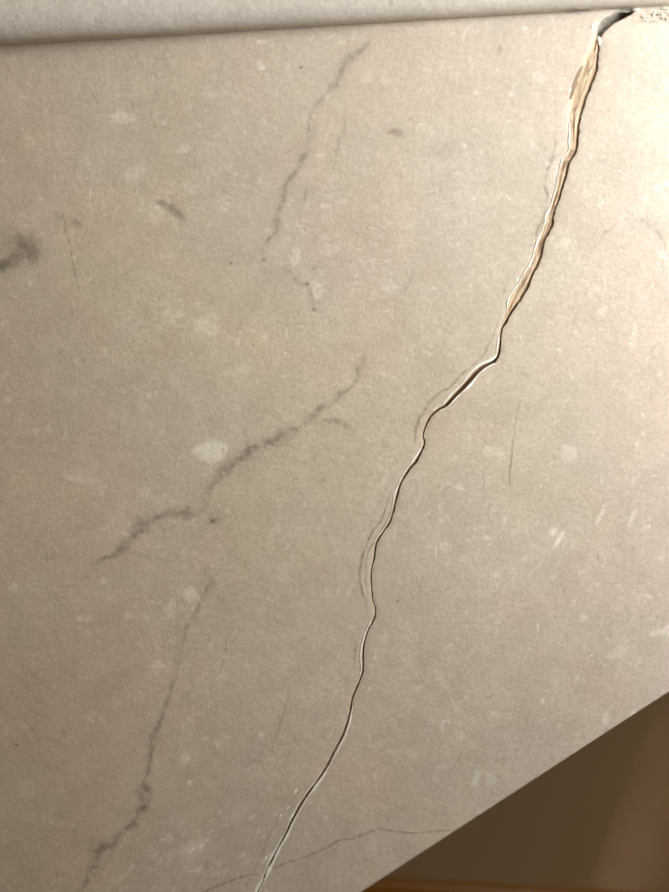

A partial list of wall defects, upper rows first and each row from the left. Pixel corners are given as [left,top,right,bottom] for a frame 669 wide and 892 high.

crack [254,35,602,892]